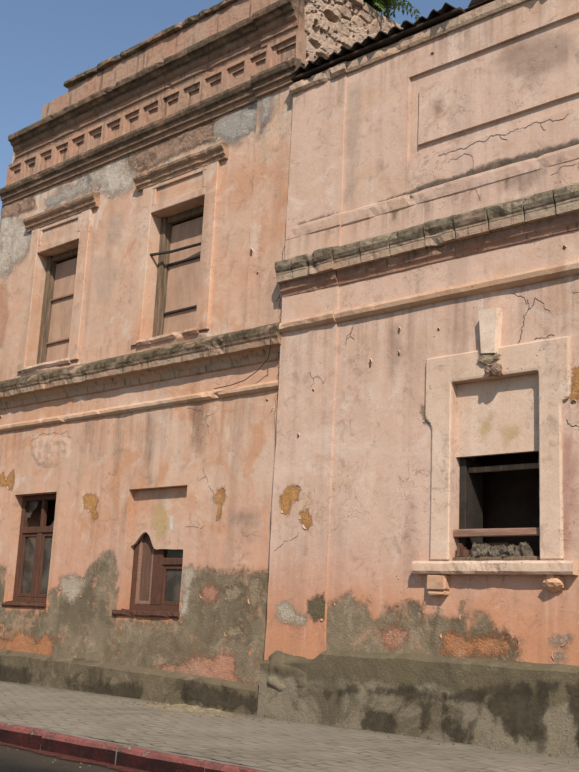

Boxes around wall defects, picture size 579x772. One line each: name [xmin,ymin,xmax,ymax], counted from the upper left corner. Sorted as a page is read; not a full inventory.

crack [438,113,569,169]
spalling [0,93,274,277]
crack [511,292,554,344]
peeling [0,550,269,685]
peeling [307,593,519,661]
damp [361,709,397,734]
damp [377,681,579,745]